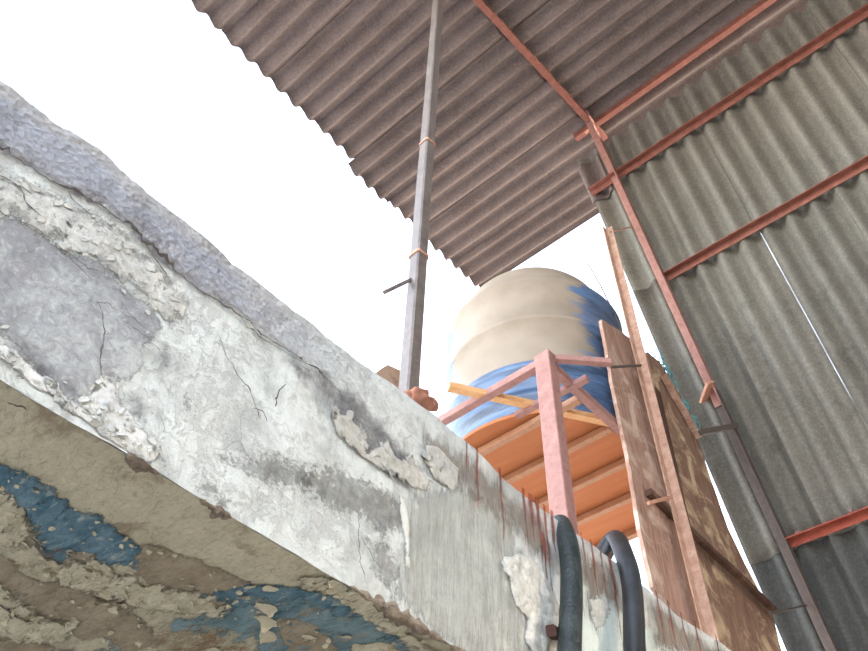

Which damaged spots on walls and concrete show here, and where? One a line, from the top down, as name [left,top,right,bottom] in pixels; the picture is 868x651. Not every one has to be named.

peeling [0,165,189,475]
crack [0,139,353,405]
crack [218,335,286,420]
peeling [0,405,528,651]
rust [522,488,556,591]
rust [580,532,622,639]